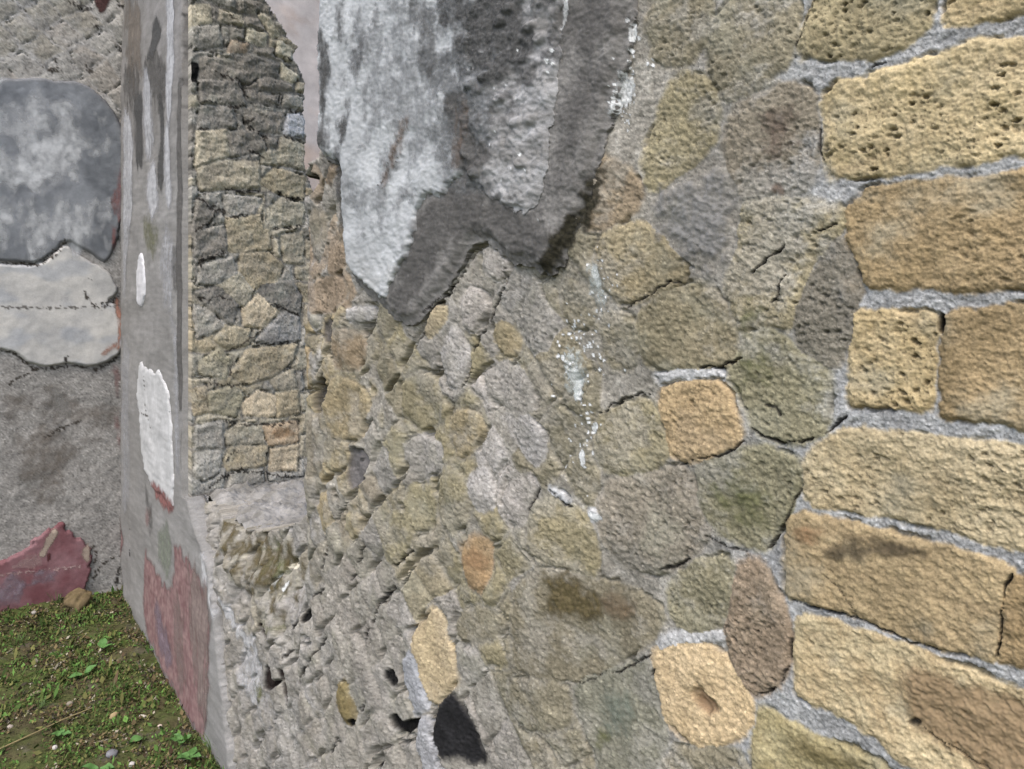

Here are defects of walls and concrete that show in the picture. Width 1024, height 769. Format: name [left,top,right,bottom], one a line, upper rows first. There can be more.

peeling [317,0,638,326]
crack [628,279,682,308]
crack [753,247,787,302]
damp [557,247,618,468]
crack [997,573,1014,655]